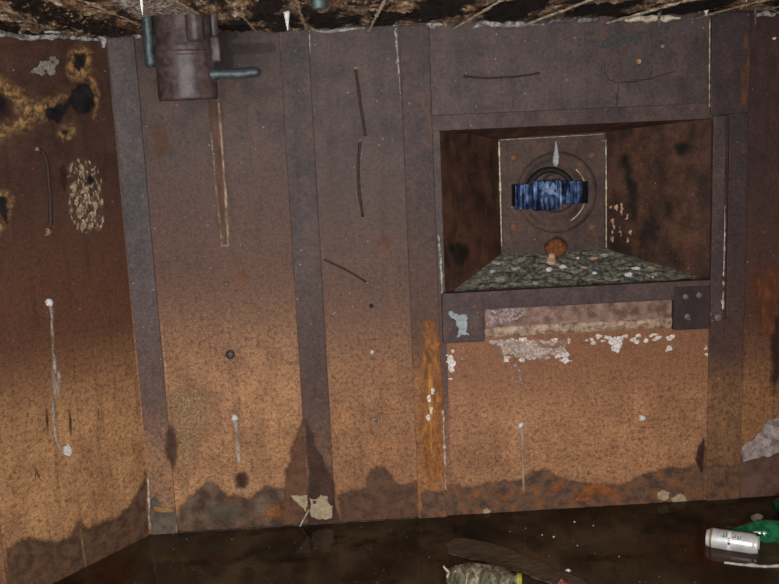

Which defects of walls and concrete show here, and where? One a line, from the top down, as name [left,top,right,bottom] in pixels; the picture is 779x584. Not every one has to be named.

damp [0,0,141,48]
damp [109,0,196,18]
damp [218,0,466,33]
damp [472,0,738,28]
damp [756,0,779,17]
damp [46,83,95,139]
peeling [489,337,572,389]
peeling [585,333,675,353]
corrosion [755,271,779,392]
corrosion [421,322,445,481]
peeling [741,418,779,462]
damp [6,421,779,584]